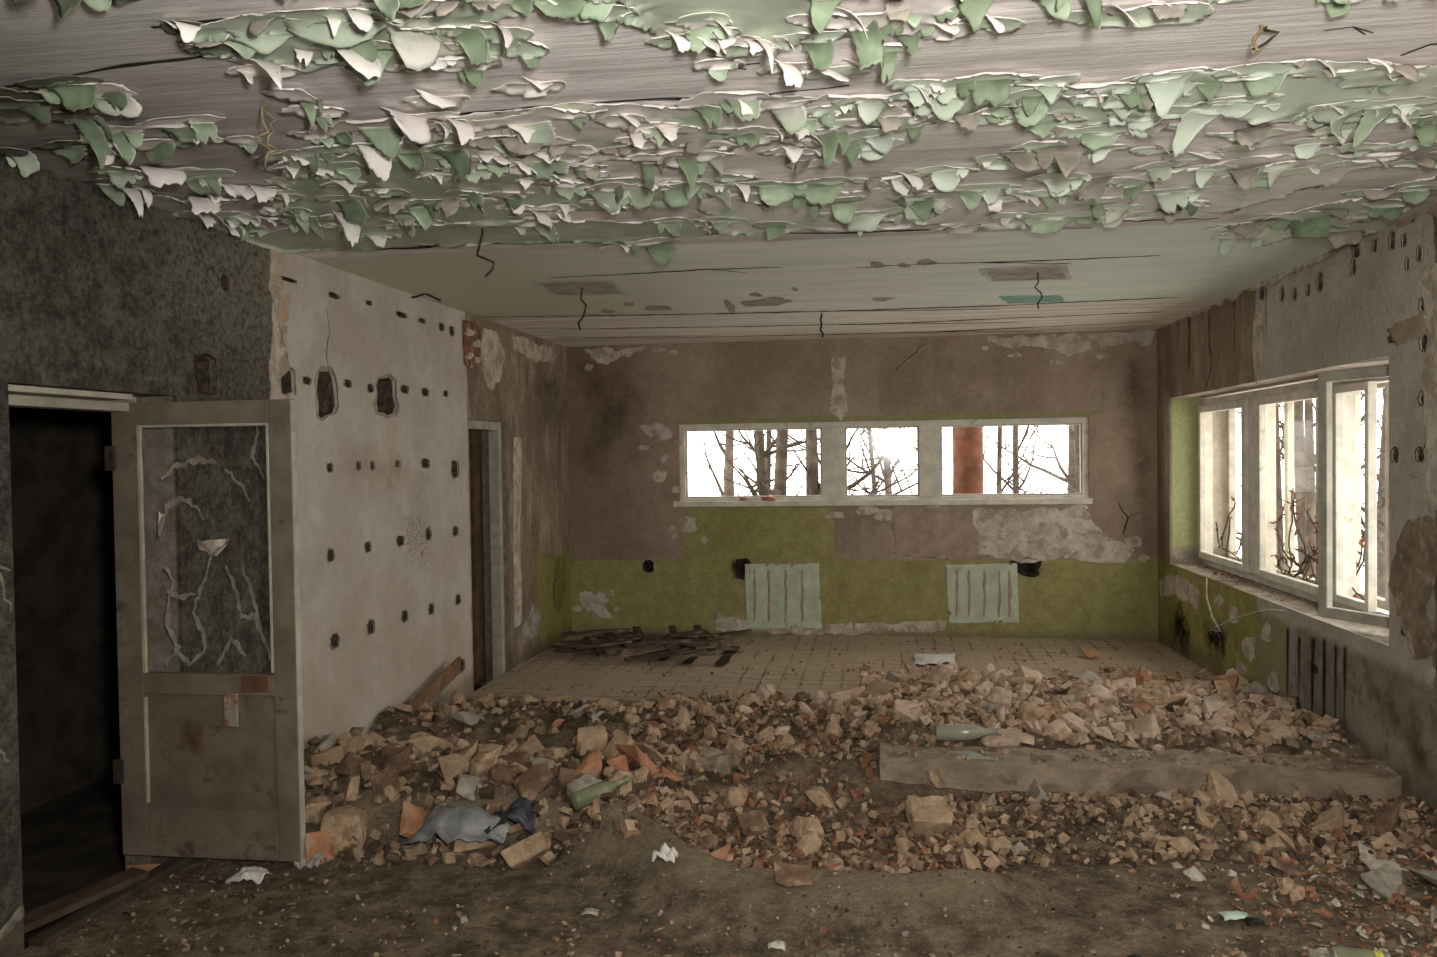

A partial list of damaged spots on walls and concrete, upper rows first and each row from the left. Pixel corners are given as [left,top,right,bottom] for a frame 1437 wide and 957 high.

spalling [304,662,948,869]
spalling [774,830,822,887]
spalling [947,779,1065,871]
spalling [1087,793,1130,819]
spalling [1276,877,1305,902]
spalling [1151,770,1437,881]